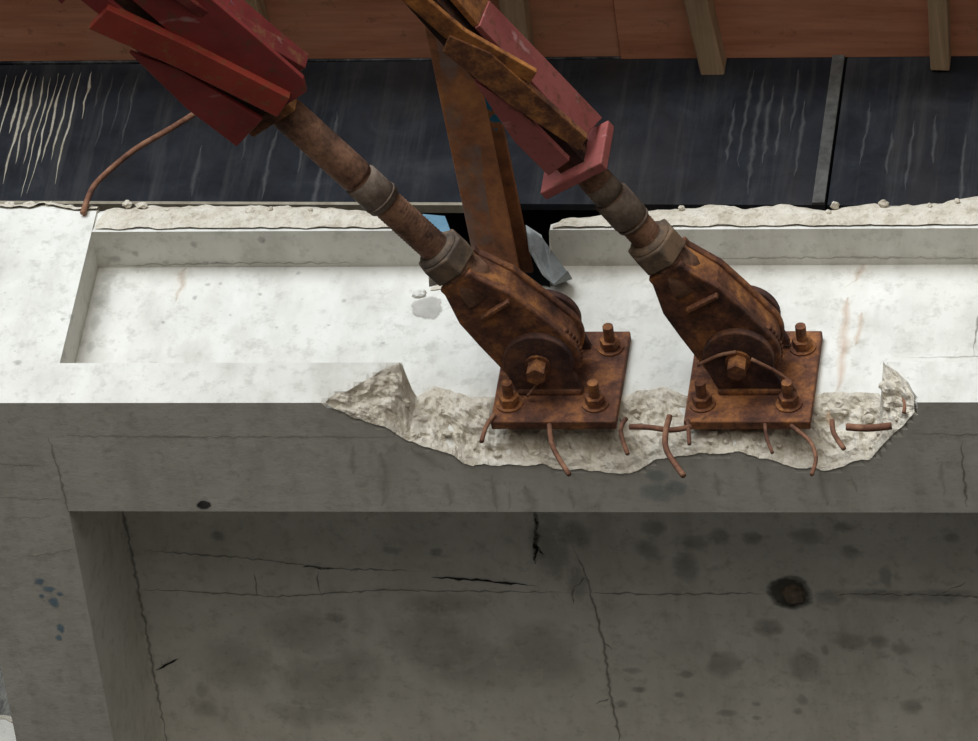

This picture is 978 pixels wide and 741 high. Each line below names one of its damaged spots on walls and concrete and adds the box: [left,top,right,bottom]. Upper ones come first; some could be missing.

spalling [552,215,611,228]
spalling [648,196,978,226]
spalling [412,285,442,319]
spalling [326,362,915,478]
crack [533,513,543,561]
crack [135,552,544,597]
crack [572,548,750,738]